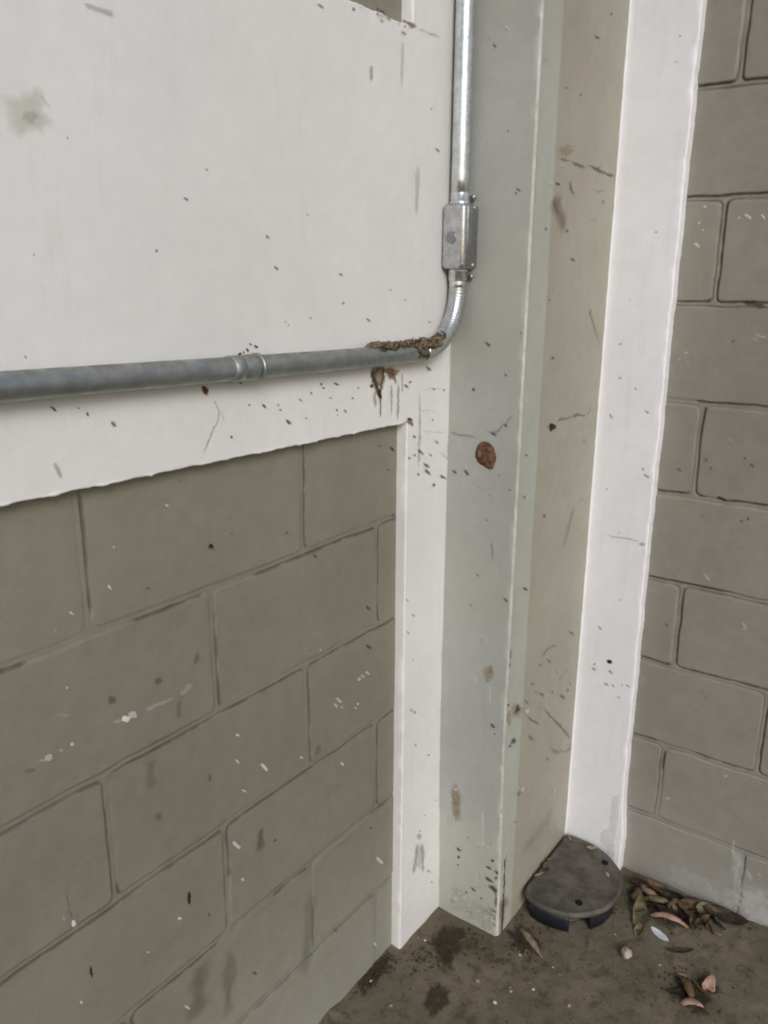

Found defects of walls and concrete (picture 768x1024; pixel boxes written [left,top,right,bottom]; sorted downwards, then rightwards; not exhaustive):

corrosion [370,367,399,416]
corrosion [475,441,496,470]